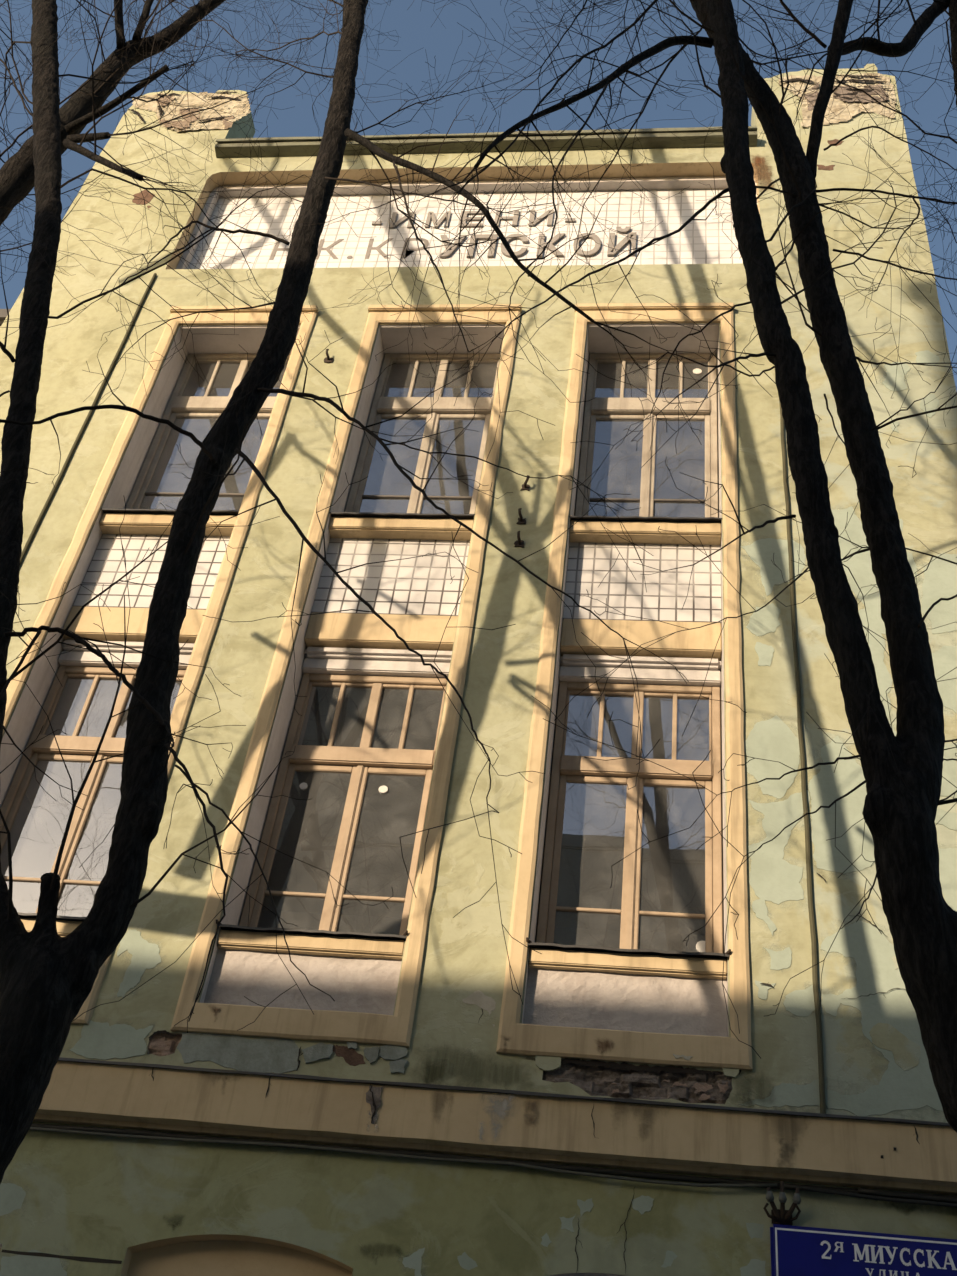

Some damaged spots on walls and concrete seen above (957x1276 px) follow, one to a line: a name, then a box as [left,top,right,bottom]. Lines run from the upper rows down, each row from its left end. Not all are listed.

spalling [129,91,251,132]
spalling [778,73,896,127]
peeling [741,538,806,666]
peeling [831,506,897,736]
peeling [907,553,957,713]
peeling [935,743,957,831]
peeling [744,715,875,1000]
peeling [938,848,957,911]
peeling [70,1020,408,1074]
peeling [526,920,943,1117]
crack [575,1219,583,1273]
crack [617,1187,635,1274]